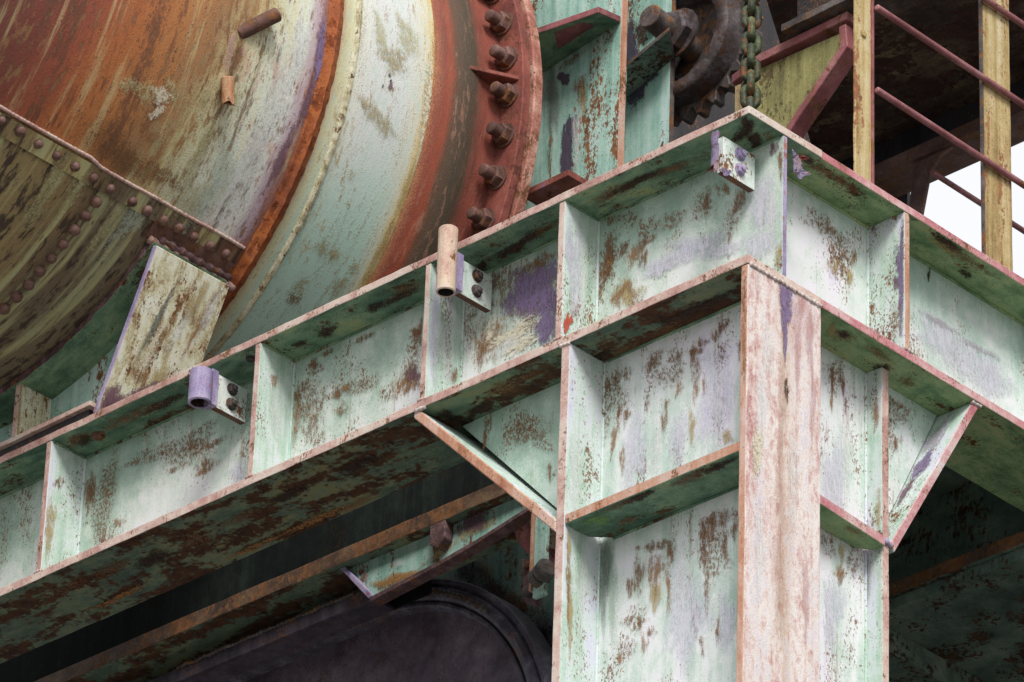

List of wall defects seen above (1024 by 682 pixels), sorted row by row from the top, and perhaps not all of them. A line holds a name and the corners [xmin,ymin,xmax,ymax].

rust [259,15,326,202]
rust [573,76,587,163]
rust [583,154,746,309]
rust [804,207,857,284]
rust [593,274,759,476]
rust [45,505,55,556]
rust [85,421,226,545]
rust [49,485,315,602]
rust [585,490,655,527]
rust [616,537,677,664]
rust [672,457,738,488]
rust [692,509,738,656]